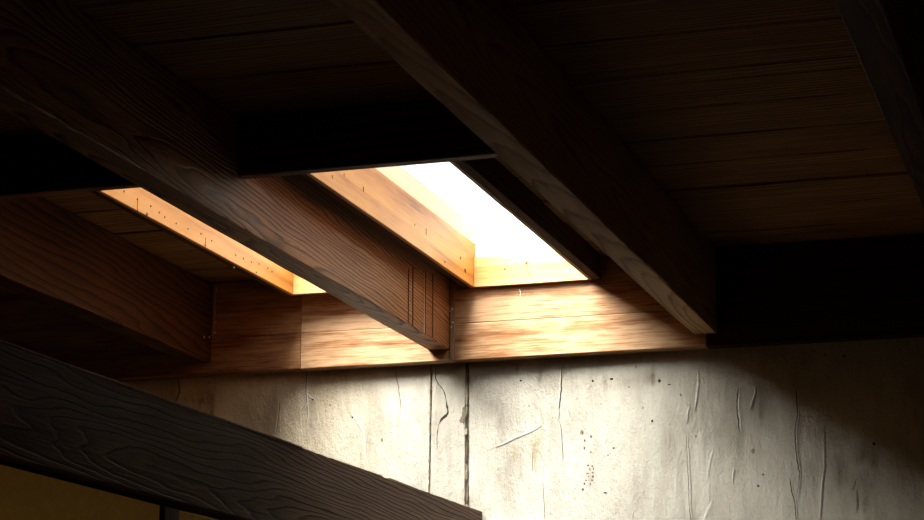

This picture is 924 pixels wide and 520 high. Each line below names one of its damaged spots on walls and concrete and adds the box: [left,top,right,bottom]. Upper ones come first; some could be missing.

crack [435,369,449,450]
crack [735,388,743,431]
crack [790,388,827,520]